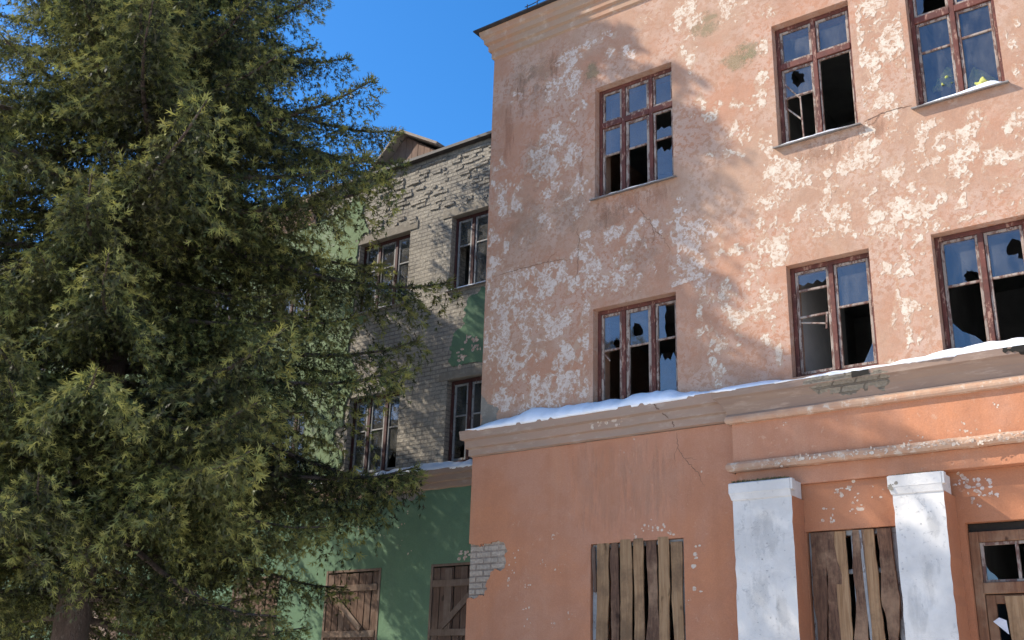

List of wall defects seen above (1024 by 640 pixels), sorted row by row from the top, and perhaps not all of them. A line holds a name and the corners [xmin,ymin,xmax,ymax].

peeling [373,0,1024,425]
crack [654,404,705,486]
peeling [766,421,1024,467]
peeling [953,472,999,507]
flaking render [457,529,531,627]